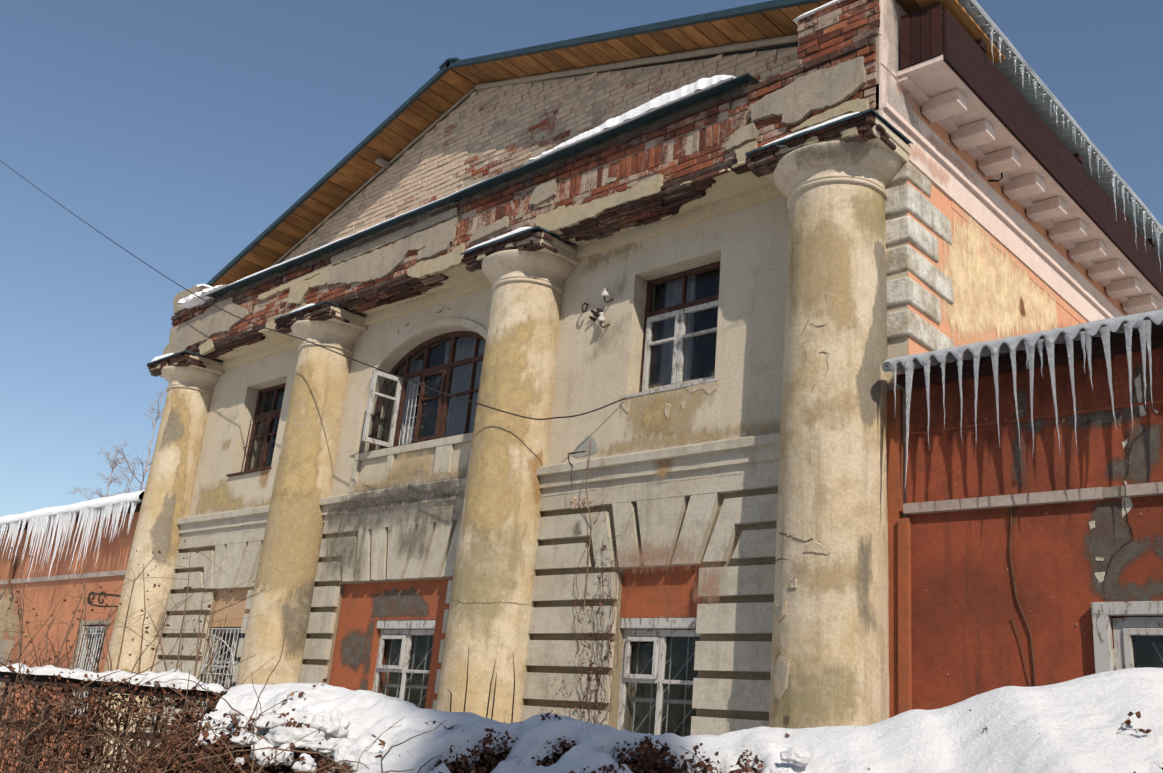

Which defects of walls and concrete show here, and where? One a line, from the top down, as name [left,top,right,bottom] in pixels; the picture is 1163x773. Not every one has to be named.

flaking render [147,37,896,377]